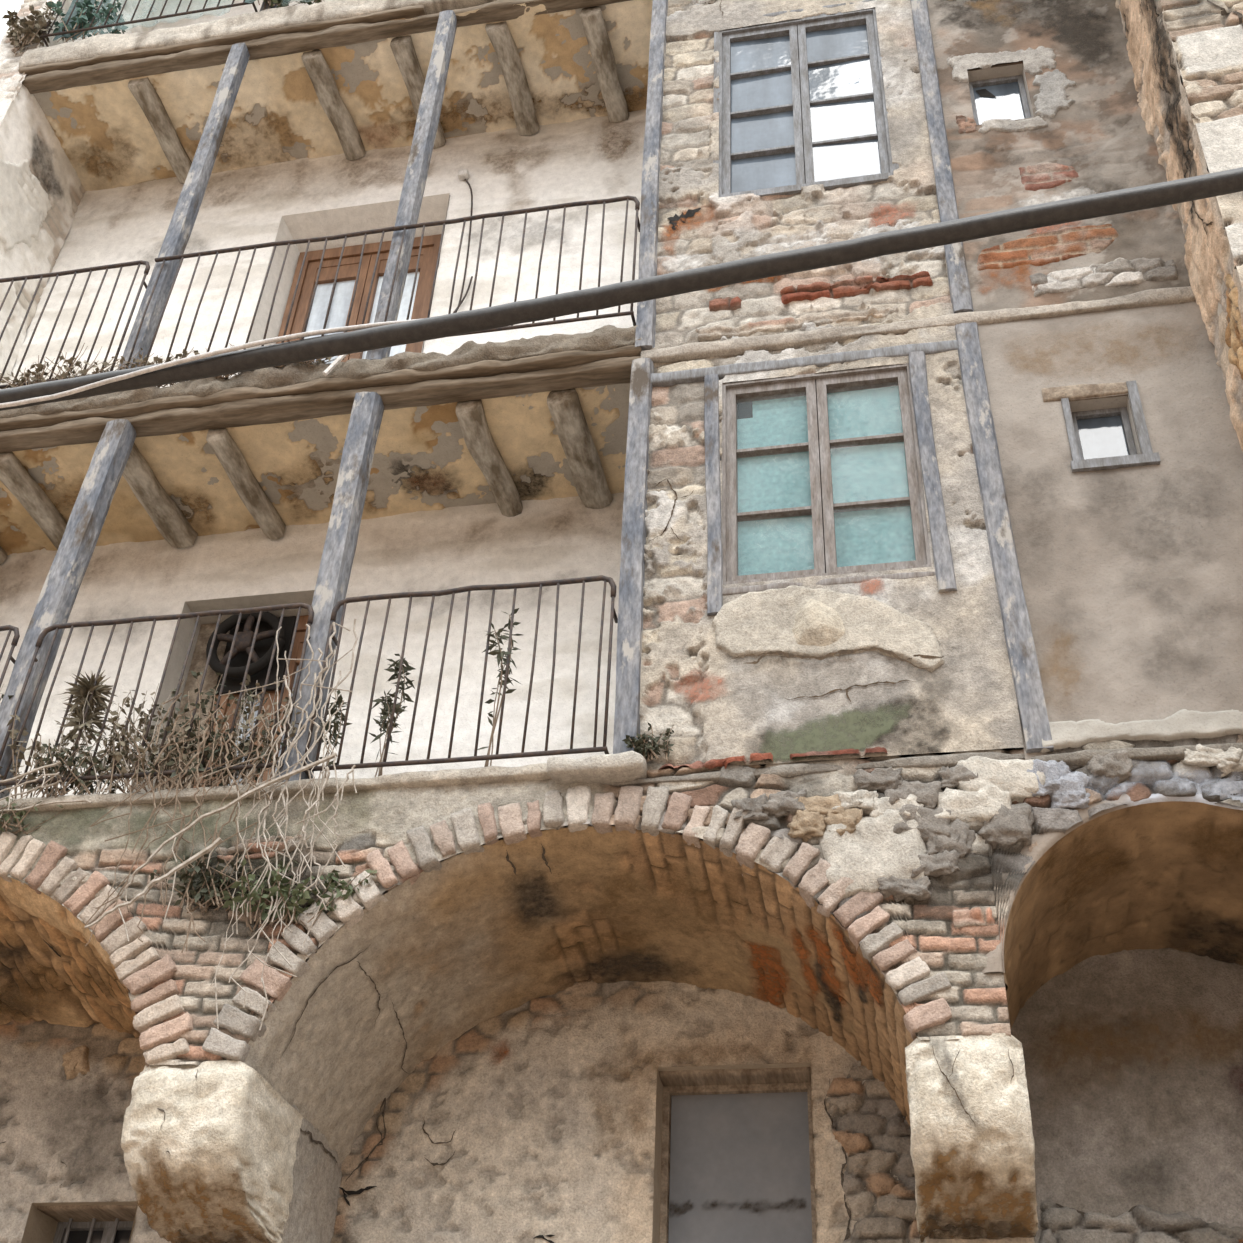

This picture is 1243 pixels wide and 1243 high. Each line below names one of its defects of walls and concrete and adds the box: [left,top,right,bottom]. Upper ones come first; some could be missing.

water stain [940,0,1109,67]
flaking render [1019,162,1095,206]
flaking render [977,224,1178,297]
crack [732,647,944,704]
water stain [874,698,949,754]
water stain [515,877,556,923]
water stain [568,952,672,983]
crack [282,944,409,1074]
crack [931,1044,975,1124]
crack [300,1098,386,1184]
crack [422,1120,456,1166]
water stain [922,1213,1025,1239]